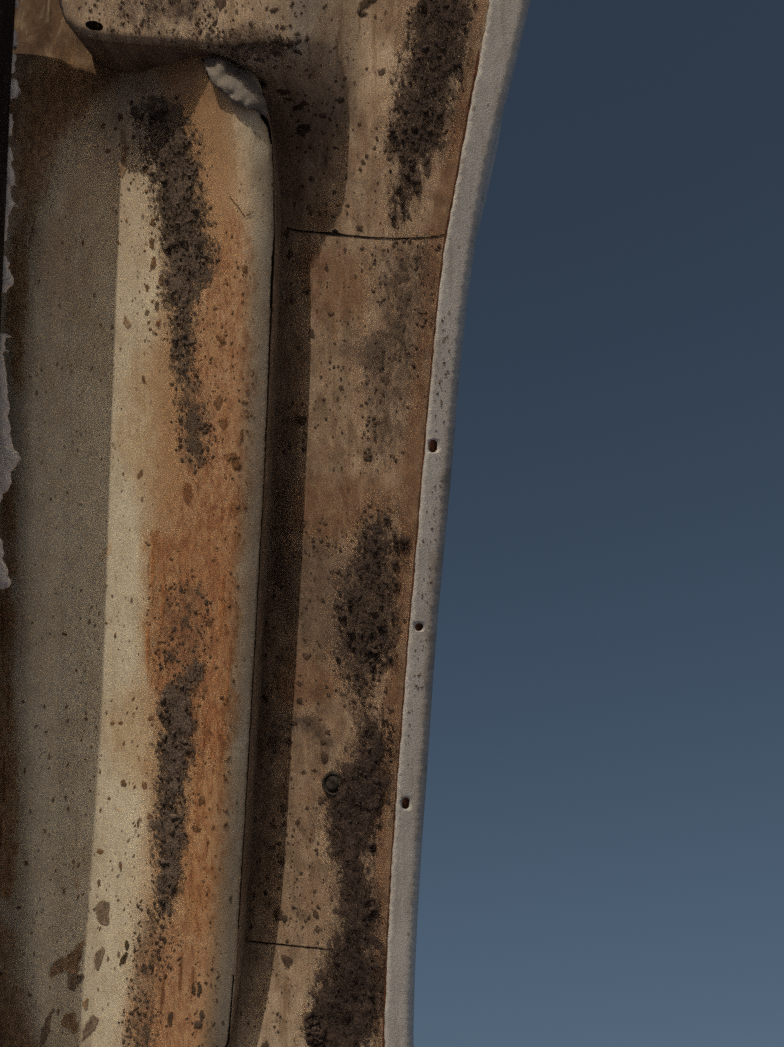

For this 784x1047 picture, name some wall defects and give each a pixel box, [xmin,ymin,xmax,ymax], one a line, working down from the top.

crack [229,93,445,950]
leakage [284,717,331,775]
crack [225,975,234,1047]